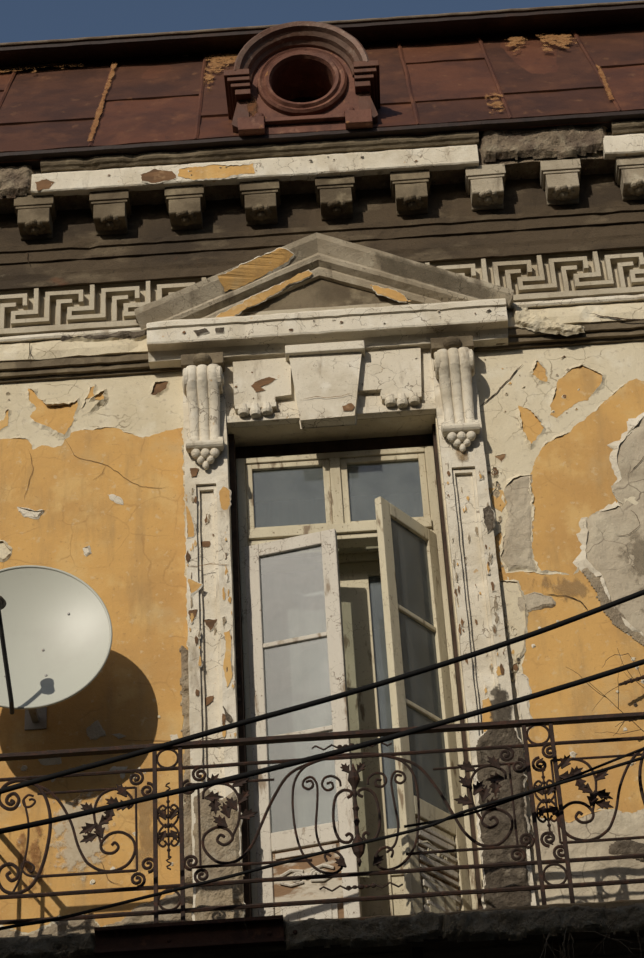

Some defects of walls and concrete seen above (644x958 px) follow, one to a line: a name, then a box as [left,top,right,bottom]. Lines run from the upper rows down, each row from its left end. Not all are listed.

corrosion [505,34,577,51]
corrosion [203,53,238,89]
corrosion [596,64,614,100]
corrosion [87,62,117,141]
corrosion [485,93,503,112]
peeling [35,179,55,191]
peeling [140,163,257,184]
peeling [218,247,295,292]
peeling [182,269,312,337]
peeling [149,380,170,397]
crack [68,444,154,488]
peeling [0,385,245,958]